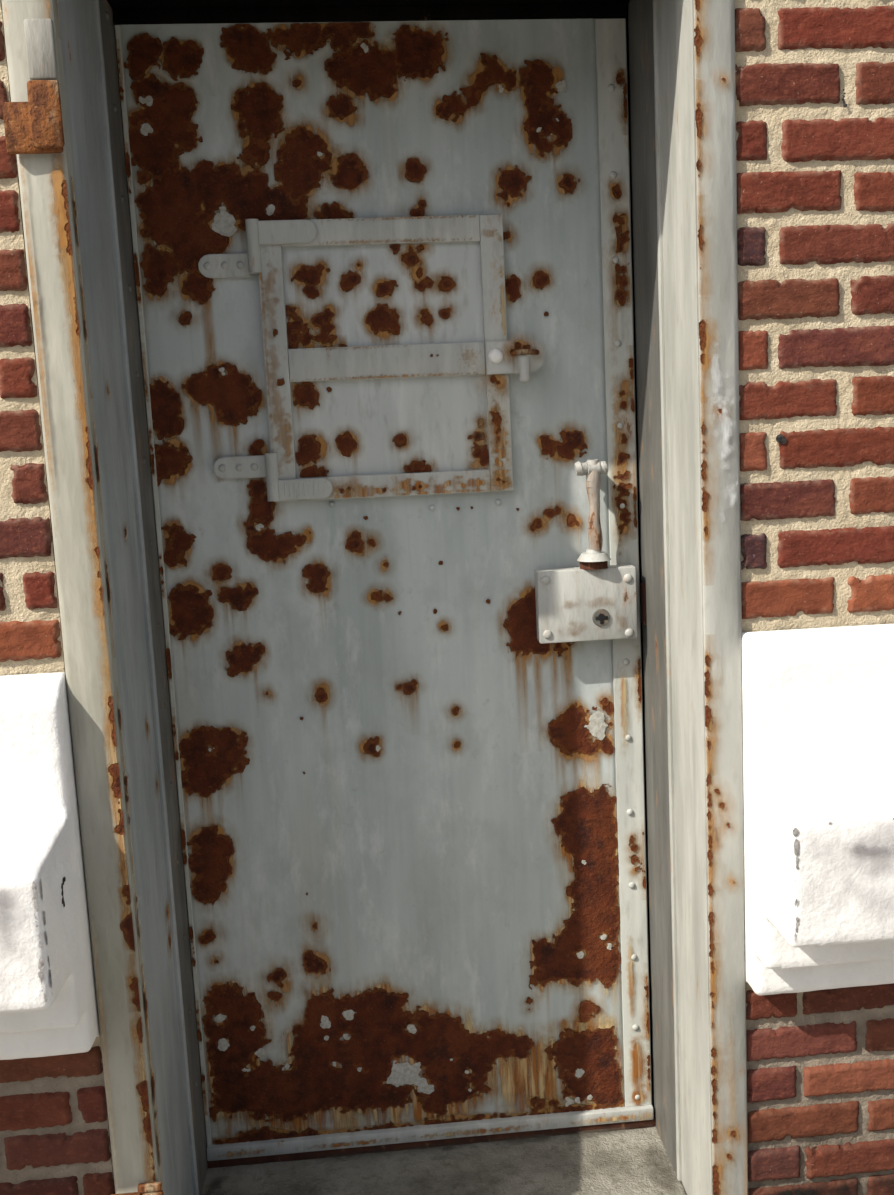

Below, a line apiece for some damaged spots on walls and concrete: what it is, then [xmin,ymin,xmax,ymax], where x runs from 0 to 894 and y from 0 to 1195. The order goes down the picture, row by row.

corrosion [433,53,573,163]
corrosion [118,22,513,511]
corrosion [699,319,725,563]
corrosion [51,168,140,951]
corrosion [159,519,259,679]
corrosion [172,717,250,807]
corrosion [243,477,332,598]
corrosion [500,585,574,691]
corrosion [546,659,642,769]
corrosion [181,823,235,905]
corrosion [196,780,651,1157]
corrosion [704,652,739,1195]